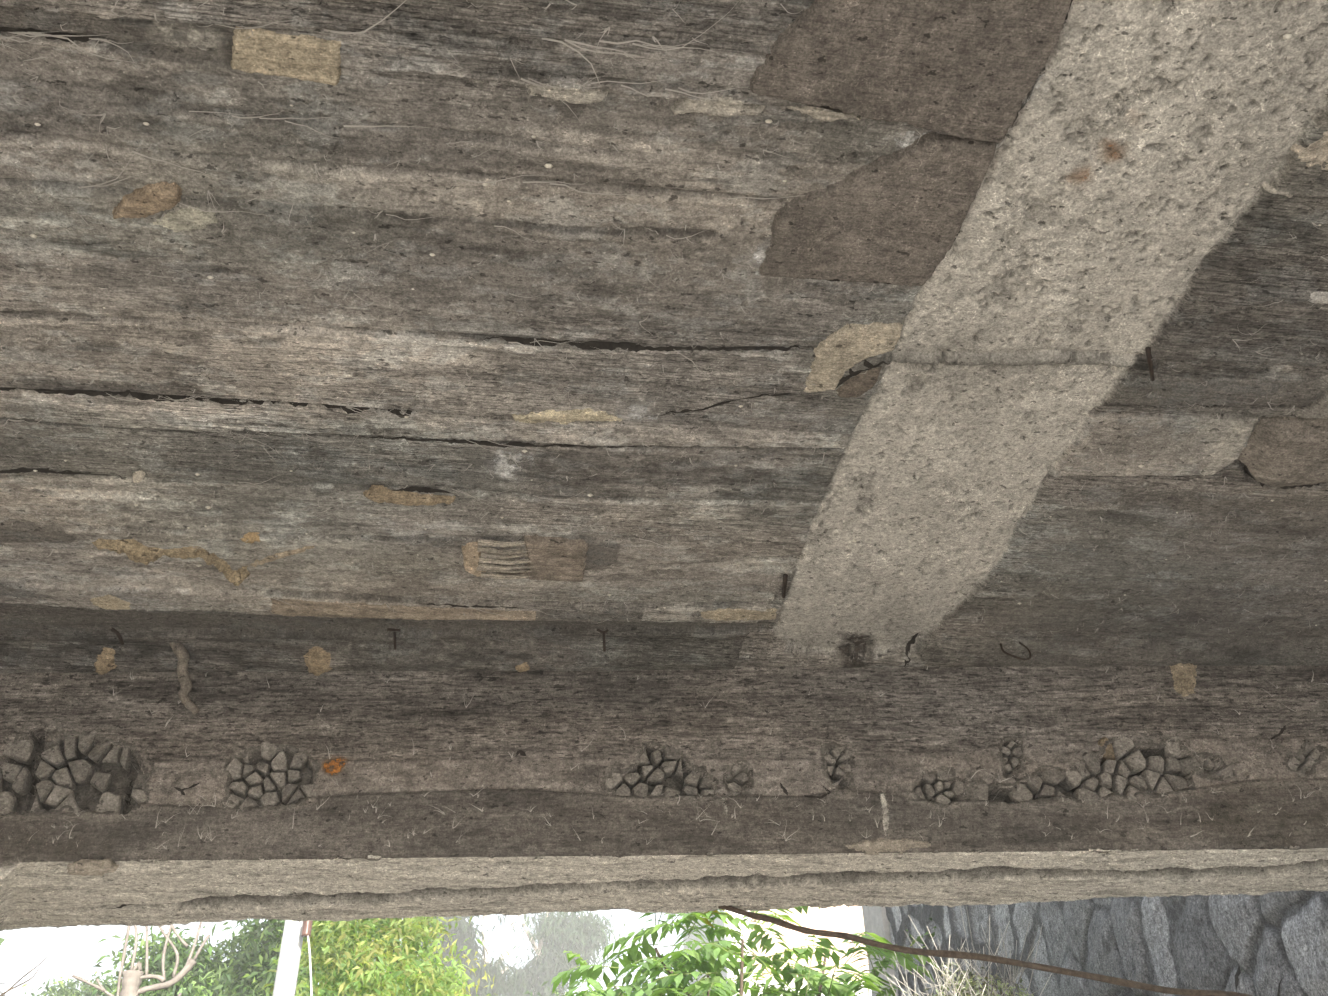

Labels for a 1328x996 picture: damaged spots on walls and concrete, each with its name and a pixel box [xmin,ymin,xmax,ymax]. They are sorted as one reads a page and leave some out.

spalling [1290,131,1328,171]
crack [482,336,808,352]
spalling [804,322,903,393]
crack [0,360,892,449]